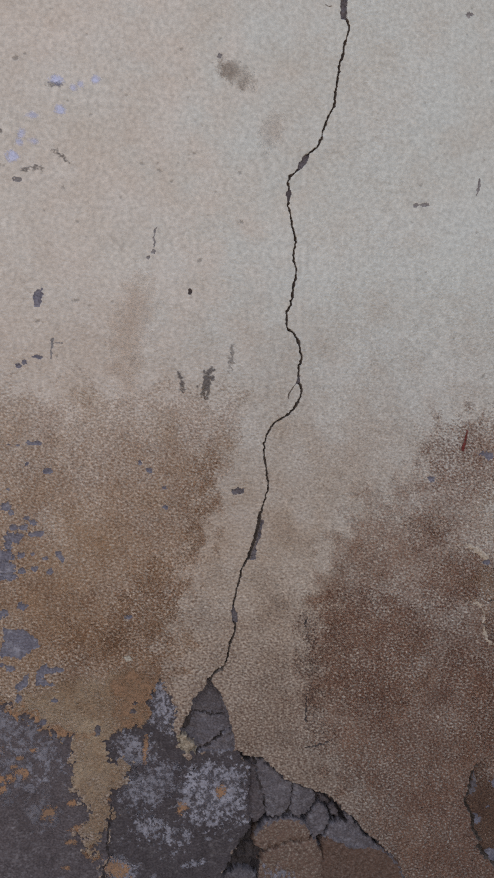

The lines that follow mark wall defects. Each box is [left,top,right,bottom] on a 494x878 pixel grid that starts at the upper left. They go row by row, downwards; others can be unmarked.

crack [209,0,350,681]
peeling [0,488,65,581]
leakage [0,448,204,855]
peeling [0,601,405,878]
leakage [307,517,494,878]
spalling [464,767,494,861]